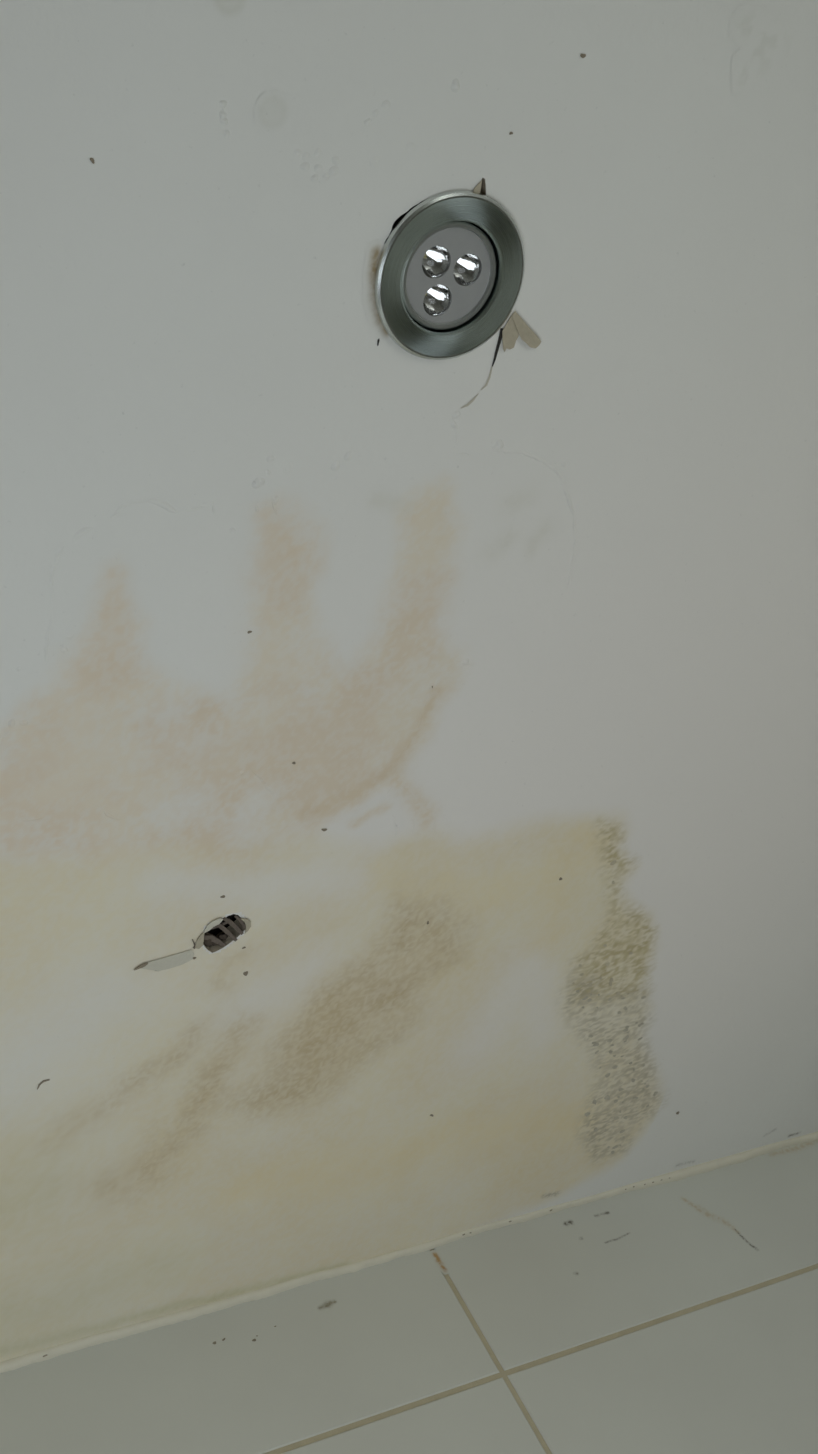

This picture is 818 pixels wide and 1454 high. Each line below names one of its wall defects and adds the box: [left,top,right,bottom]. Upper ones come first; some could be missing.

crack [461,328,504,408]
spalling [134,914,251,971]
damp [0,467,674,1362]